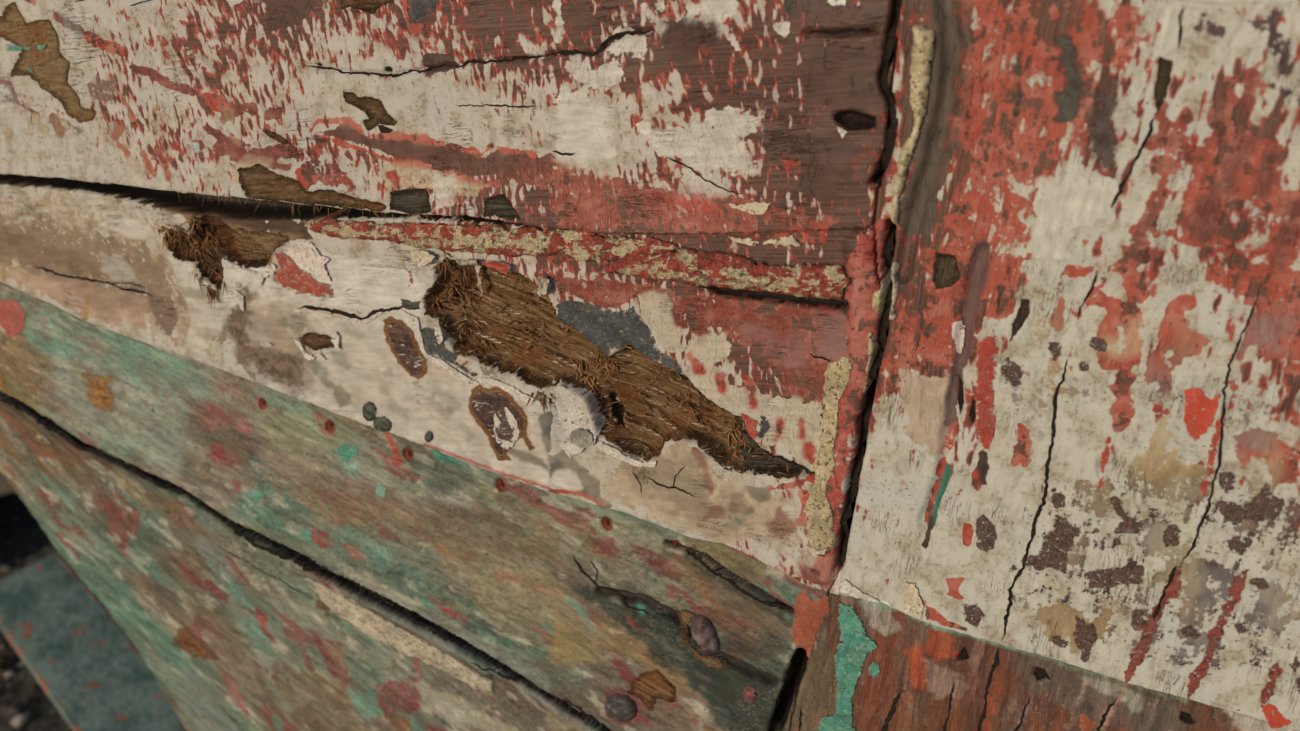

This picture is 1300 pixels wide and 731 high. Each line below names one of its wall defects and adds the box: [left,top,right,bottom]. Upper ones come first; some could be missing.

peeling [0,2,96,123]
peeling [322,0,436,37]
crack [304,29,653,78]
crack [457,102,536,110]
spalling [401,250,815,478]
crack [0,399,179,494]
crack [633,467,696,498]
crack [687,550,793,609]
crack [943,360,1067,731]
crack [1096,289,1259,731]
crack [224,524,611,731]
crack [881,691,901,731]